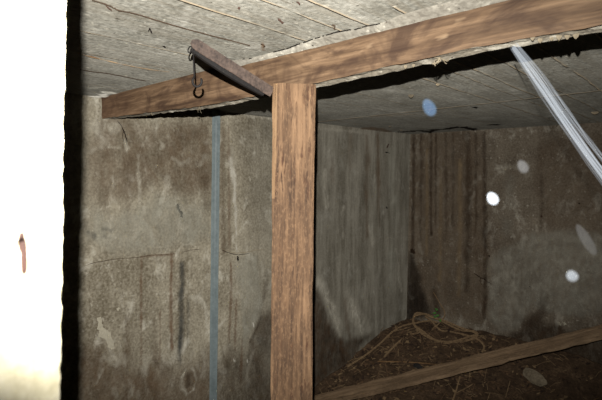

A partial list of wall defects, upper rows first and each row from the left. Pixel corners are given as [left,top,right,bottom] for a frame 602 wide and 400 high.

crack [402,125,478,133]
leakage [407,256,426,319]